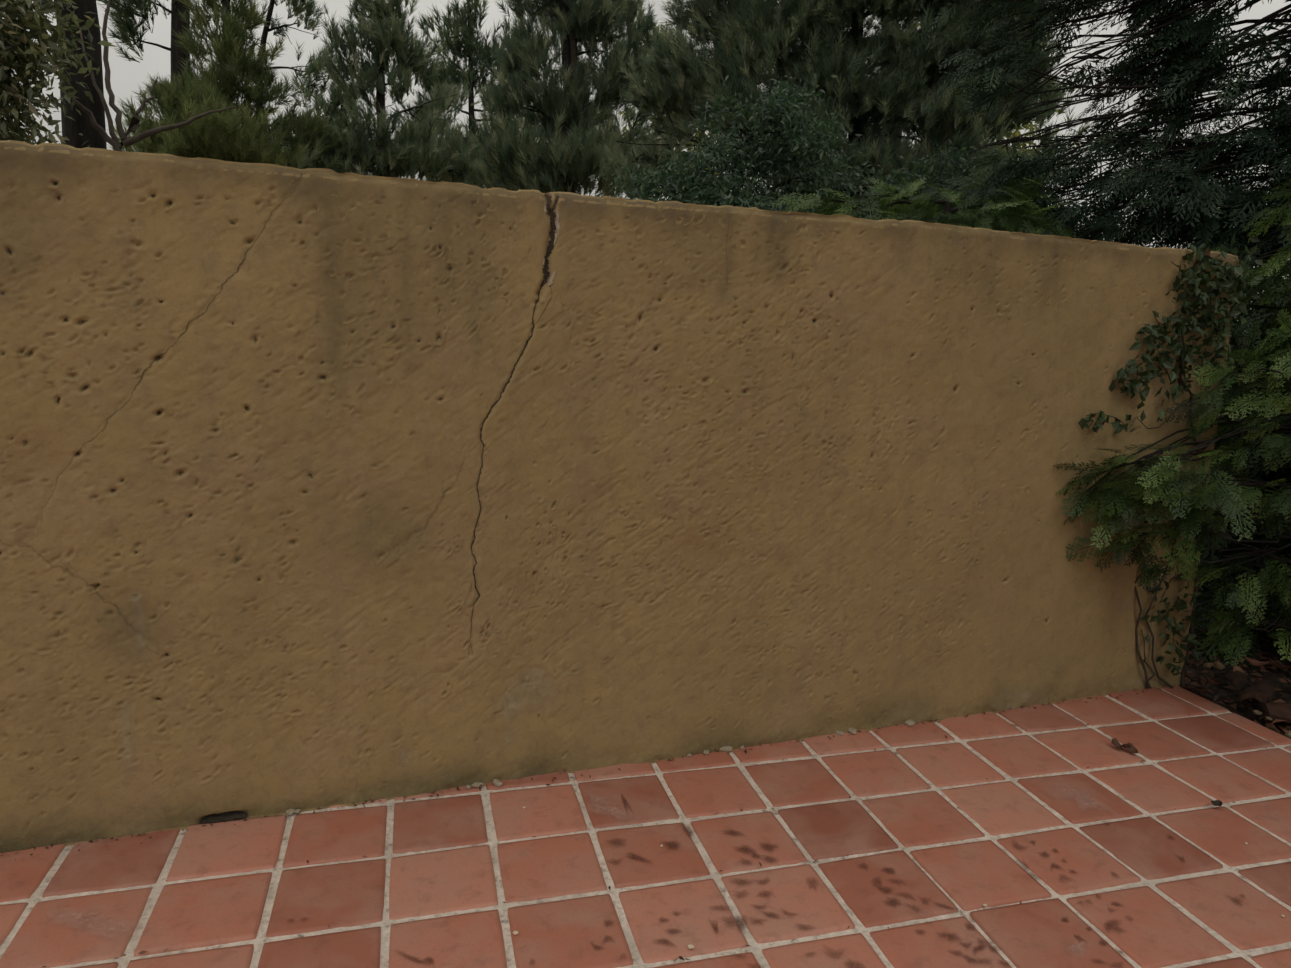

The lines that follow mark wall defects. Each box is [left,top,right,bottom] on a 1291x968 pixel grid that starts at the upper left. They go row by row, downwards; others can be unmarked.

crack [469,195,560,653]